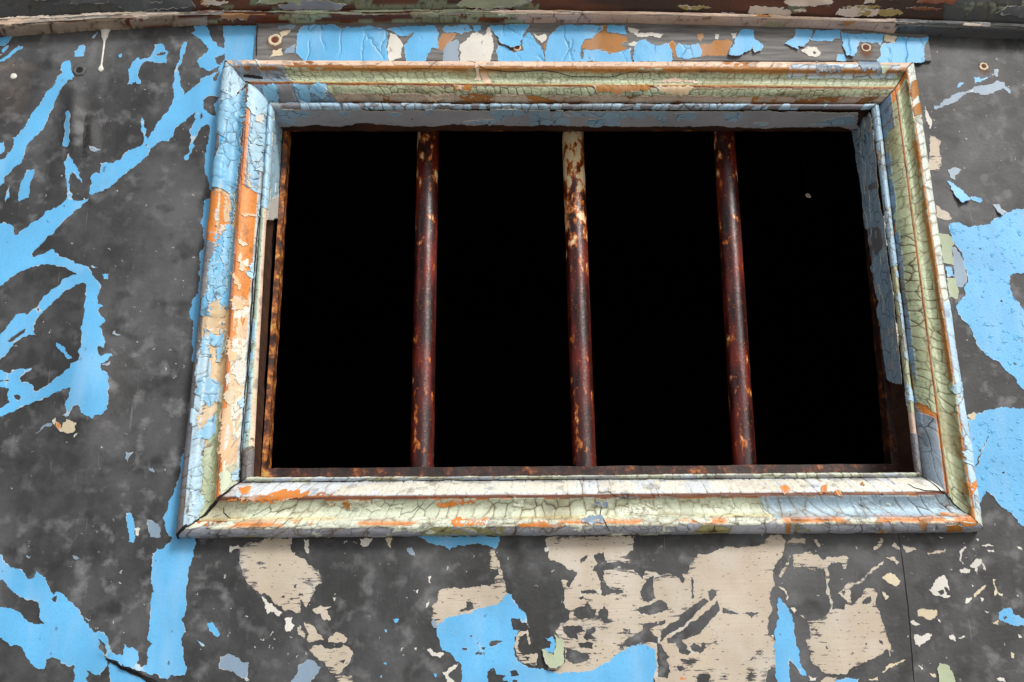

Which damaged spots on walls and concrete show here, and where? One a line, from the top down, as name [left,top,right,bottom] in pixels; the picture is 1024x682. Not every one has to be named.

peeling [0,0,1024,526]
crack [176,194,262,539]
peeling [0,453,196,682]
crack [106,658,154,682]
peeling [219,654,249,681]
peeling [229,538,353,682]
peeling [407,499,977,682]
peeling [959,539,1024,638]